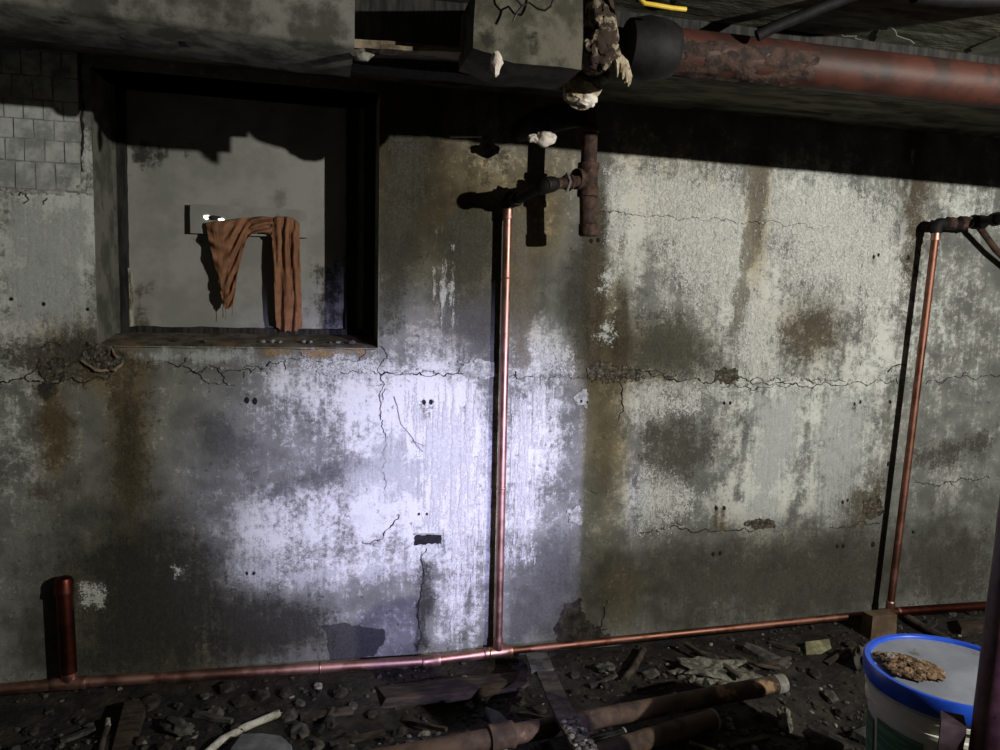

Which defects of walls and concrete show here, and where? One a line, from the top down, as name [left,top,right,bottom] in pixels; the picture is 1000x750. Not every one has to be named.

crack [598,210,823,229]
crack [0,341,110,385]
leakage [432,90,930,642]
crack [926,372,1000,384]
crack [148,346,905,485]
crack [640,519,768,534]
leakage [78,523,386,676]
crack [416,549,427,652]
spalling [554,598,612,642]